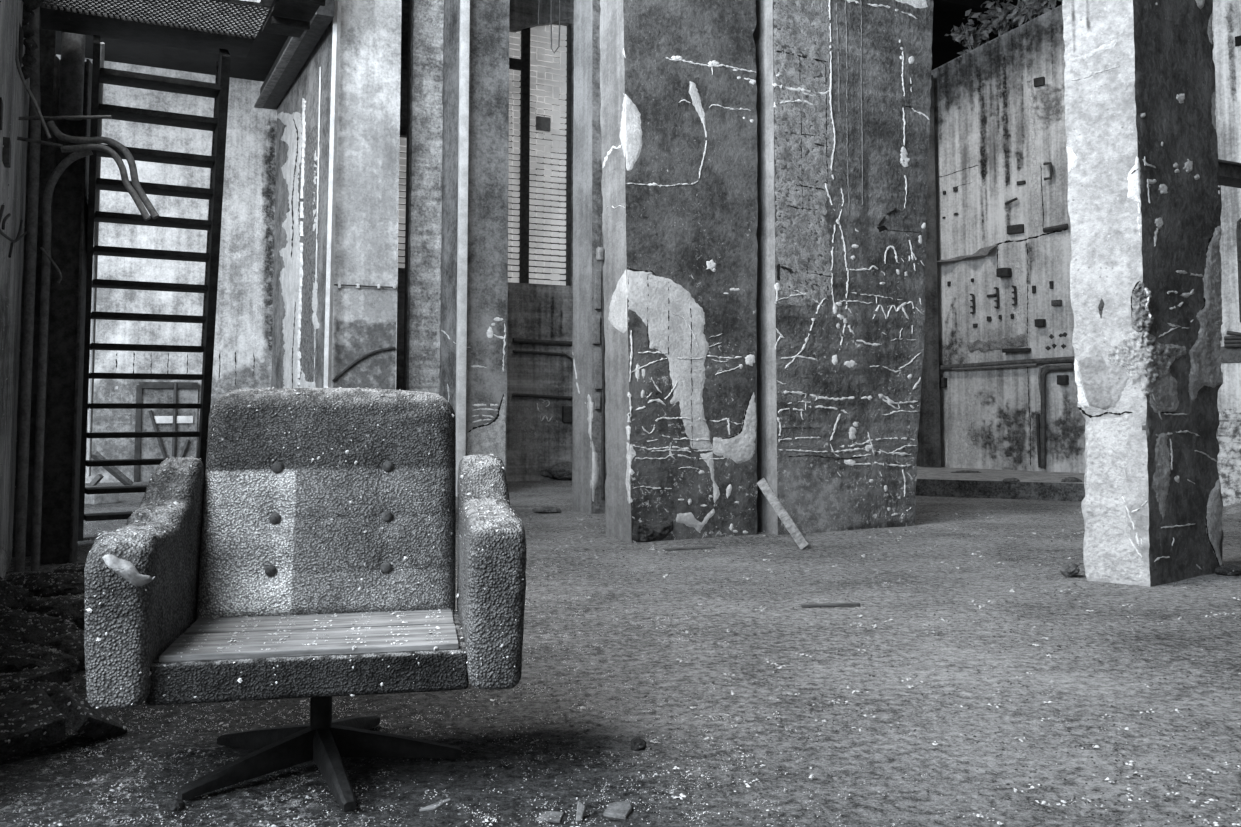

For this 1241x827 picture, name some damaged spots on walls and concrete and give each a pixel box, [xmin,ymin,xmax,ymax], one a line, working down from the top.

leakage [88,122,277,475]
peeling [602,94,643,171]
spalling [666,56,756,85]
spalling [772,0,928,517]
spalling [899,40,929,208]
leakage [938,36,1039,226]
spalling [1127,156,1168,246]
spalling [1173,159,1200,180]
peeling [608,268,756,533]
crack [786,427,861,460]
leakage [967,370,1085,464]
spalling [1074,226,1223,583]